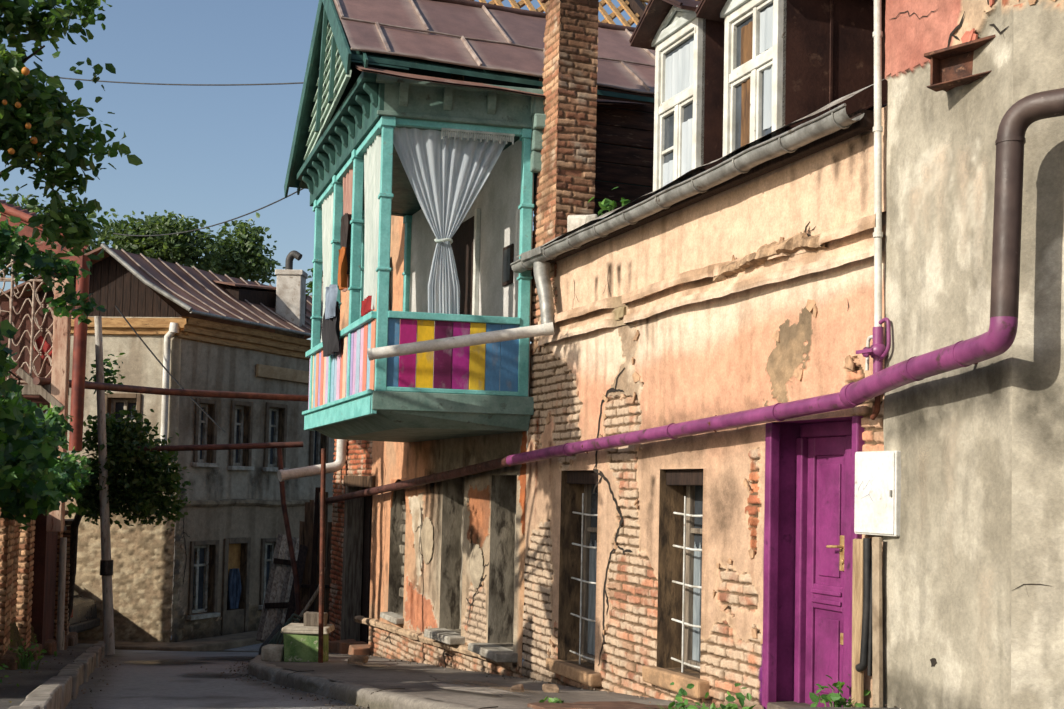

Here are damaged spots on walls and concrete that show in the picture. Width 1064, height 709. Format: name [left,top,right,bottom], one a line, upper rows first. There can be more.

crack [889,0,1009,47]
flaking render [952,0,1037,46]
spalling [550,265,558,315]
flaking render [763,299,818,407]
spalling [368,285,763,709]
crack [592,367,632,665]